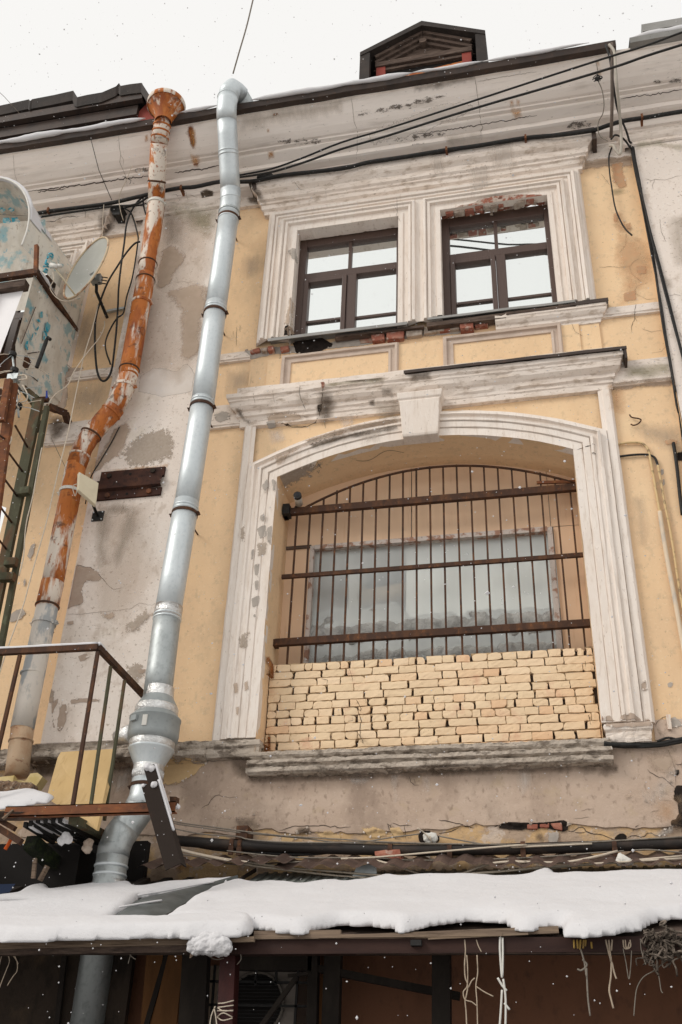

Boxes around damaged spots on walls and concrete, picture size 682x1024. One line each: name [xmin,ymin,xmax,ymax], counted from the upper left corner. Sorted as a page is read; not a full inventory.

rust [188,127,198,165]
spalling [449,194,541,219]
spalling [245,315,495,359]
leakage [321,396,332,417]
peeling [94,424,177,471]
spalling [68,566,101,608]
spalling [497,820,572,842]